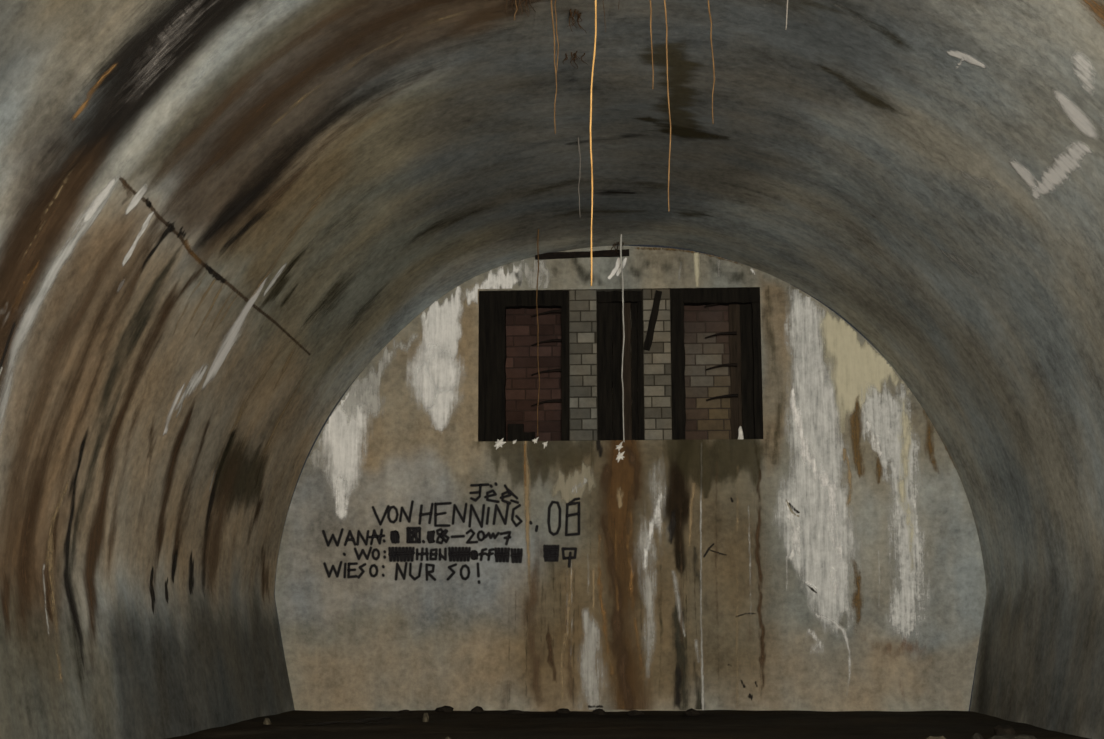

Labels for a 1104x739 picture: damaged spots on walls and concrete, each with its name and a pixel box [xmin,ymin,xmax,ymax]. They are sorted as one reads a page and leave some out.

crack [119,177,310,355]
water stain [202,377,304,580]
water stain [311,259,549,519]
corrosion [598,440,646,710]
water stain [639,439,763,710]
water stain [775,289,928,665]
corrosion [850,397,864,477]
corrosion [853,561,862,621]
corrosion [924,411,955,469]